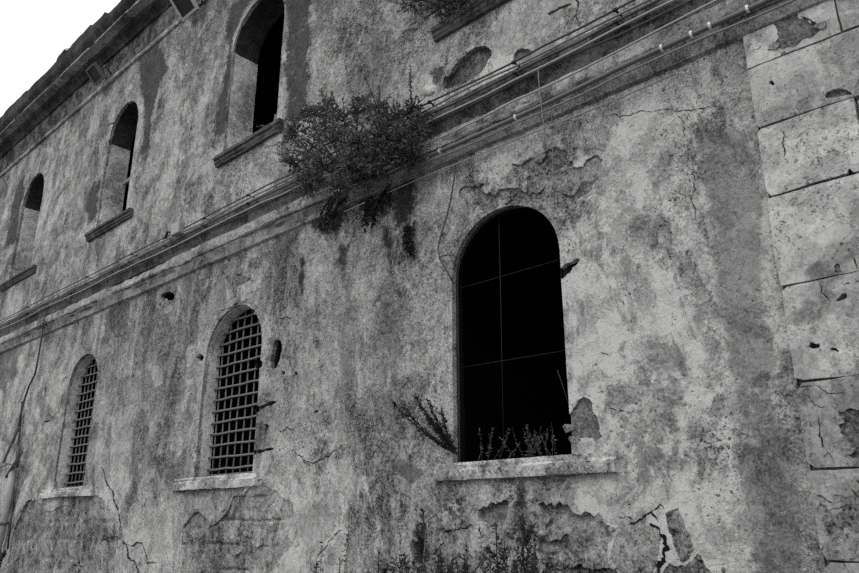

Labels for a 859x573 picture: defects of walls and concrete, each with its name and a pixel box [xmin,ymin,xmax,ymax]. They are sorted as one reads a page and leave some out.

leakage [430,67,444,82]
peeling [459,147,602,215]
leakage [311,178,417,277]
peeling [563,397,602,443]
peeling [821,408,859,458]
spalling [170,479,340,573]
leakage [411,524,430,563]
spalling [482,501,508,525]
leakage [516,483,525,545]
spalling [540,499,618,573]
peeling [664,508,712,573]